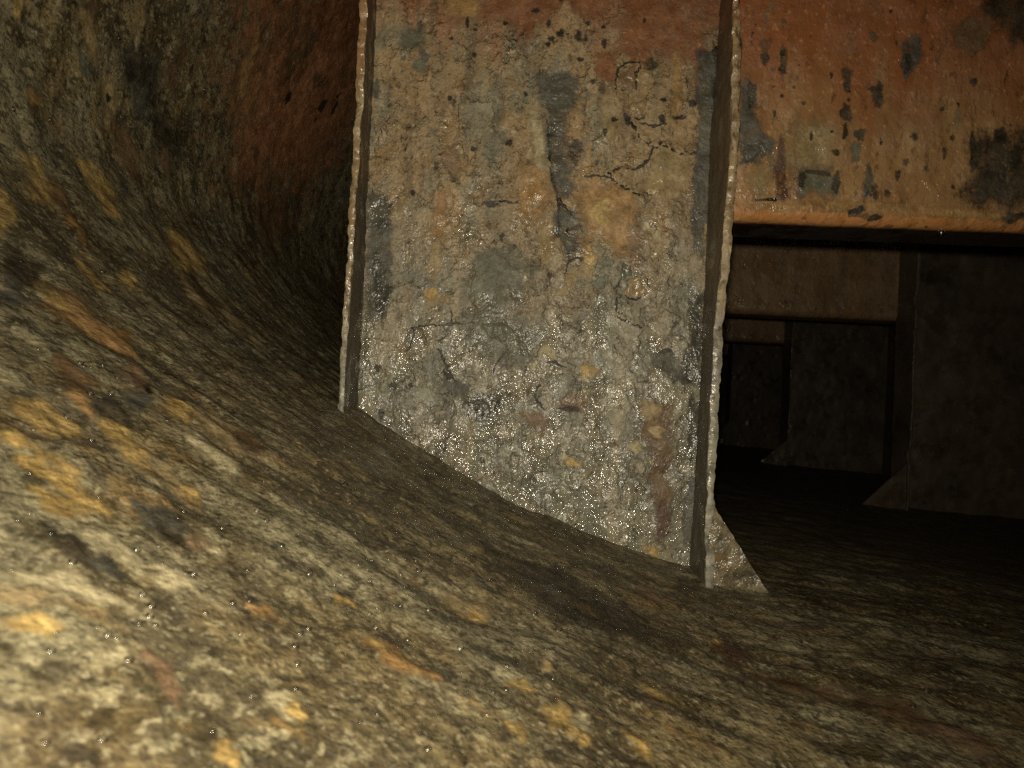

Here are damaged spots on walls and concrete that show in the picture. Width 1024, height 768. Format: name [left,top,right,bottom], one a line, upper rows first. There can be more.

rust [760,39,787,79]
water stain [533,72,582,260]
crack [584,112,699,196]
rust [745,122,838,201]
water stain [960,127,1024,224]
water stain [463,248,541,369]
water stain [442,378,503,422]
water stain [681,295,704,543]
rust [640,398,675,557]